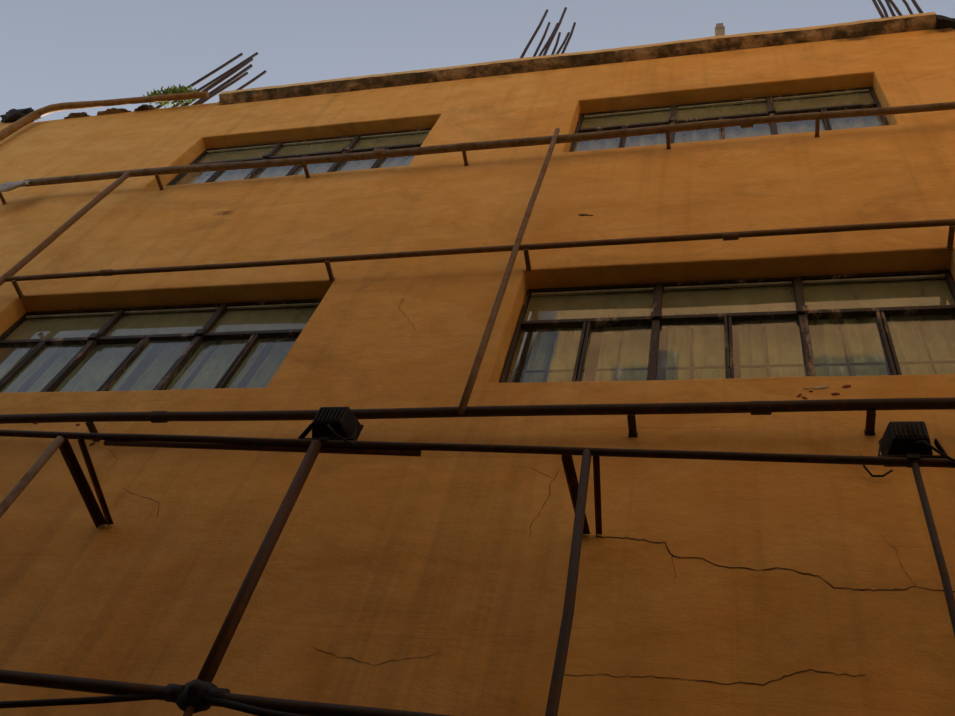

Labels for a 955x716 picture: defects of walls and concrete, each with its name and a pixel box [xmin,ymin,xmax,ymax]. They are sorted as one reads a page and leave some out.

crack [597,536,955,592]
crack [314,647,442,666]
crack [564,669,860,686]